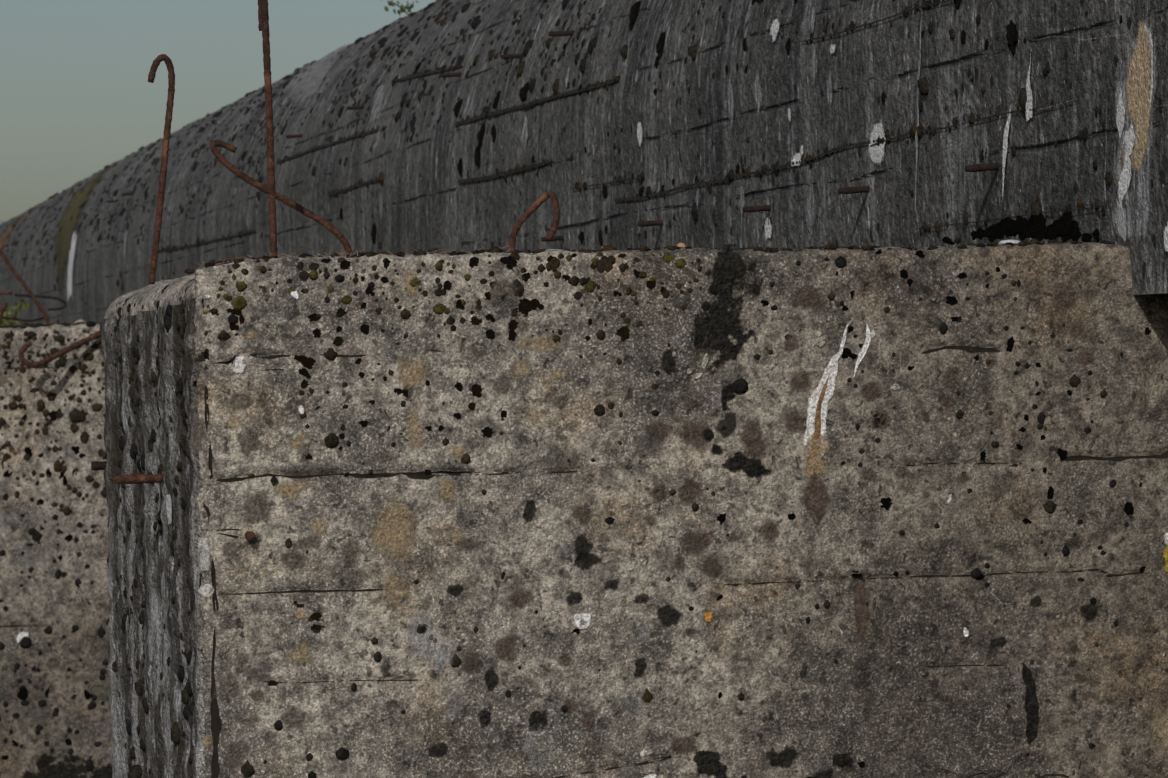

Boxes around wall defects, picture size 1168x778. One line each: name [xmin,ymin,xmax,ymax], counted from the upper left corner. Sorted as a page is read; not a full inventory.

damp [802,319,853,524]
damp [854,323,886,376]